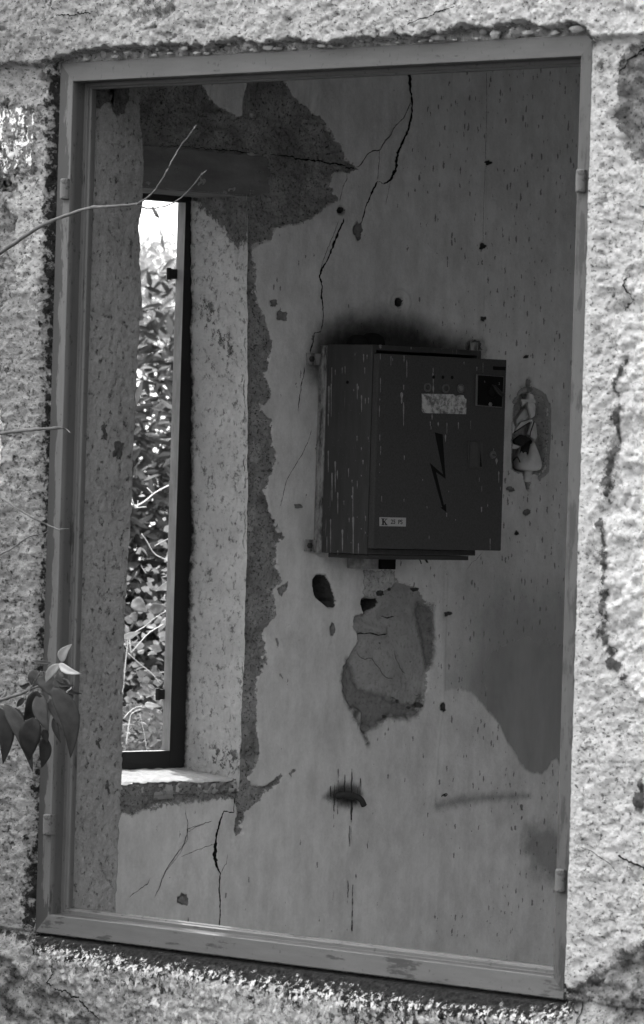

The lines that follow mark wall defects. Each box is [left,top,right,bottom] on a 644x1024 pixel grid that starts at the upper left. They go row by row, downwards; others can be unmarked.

damp [33,62,60,672]
spalling [96,81,356,836]
crack [145,75,413,409]
damp [591,262,644,699]
crack [130,781,235,925]
damp [20,737,579,1024]
spalling [341,582,435,745]
damp [481,636,564,773]